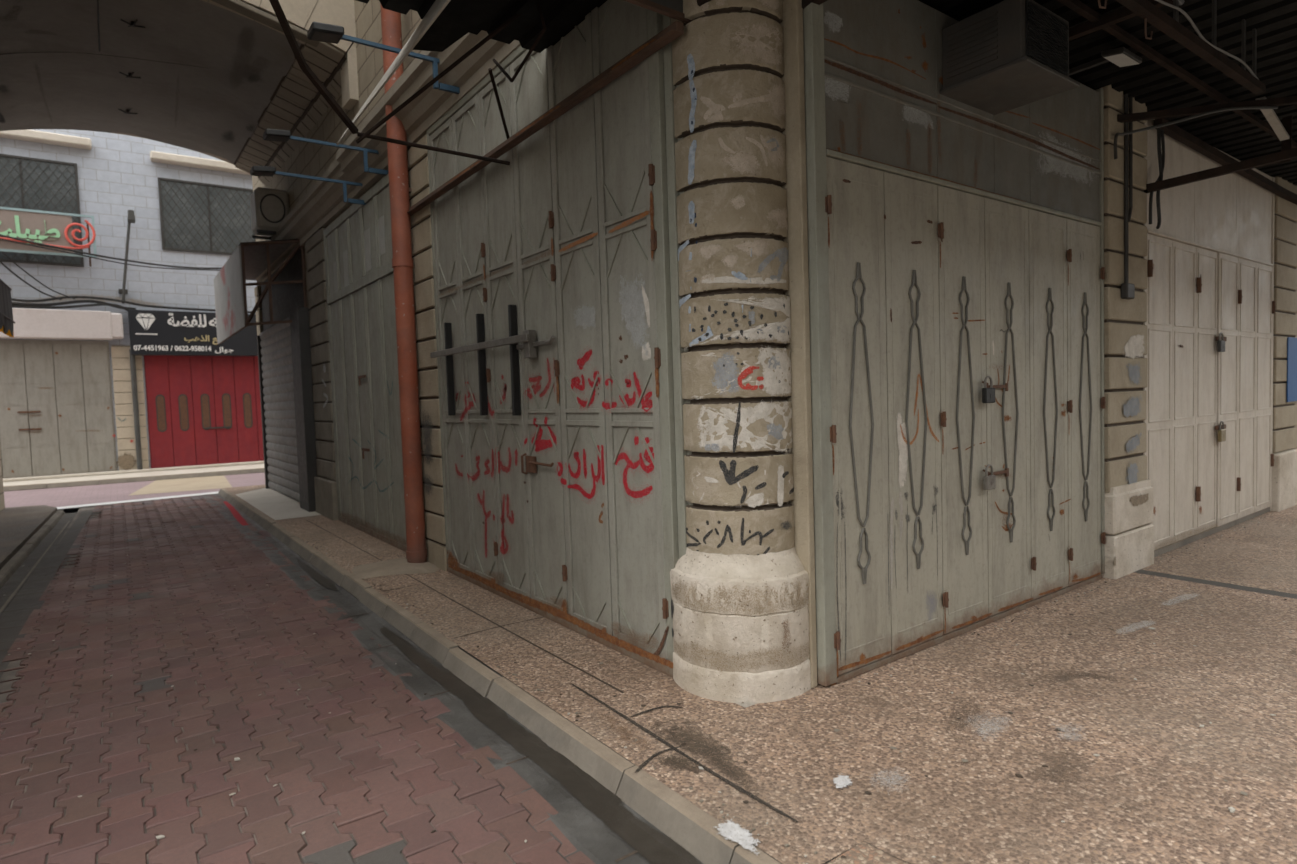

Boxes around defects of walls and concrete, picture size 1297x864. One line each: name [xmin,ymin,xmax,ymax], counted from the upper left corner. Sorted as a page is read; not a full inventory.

peeling [684,208,793,508]
peeling [1124,334,1145,359]
rust [446,550,673,669]
rust [830,544,1101,686]